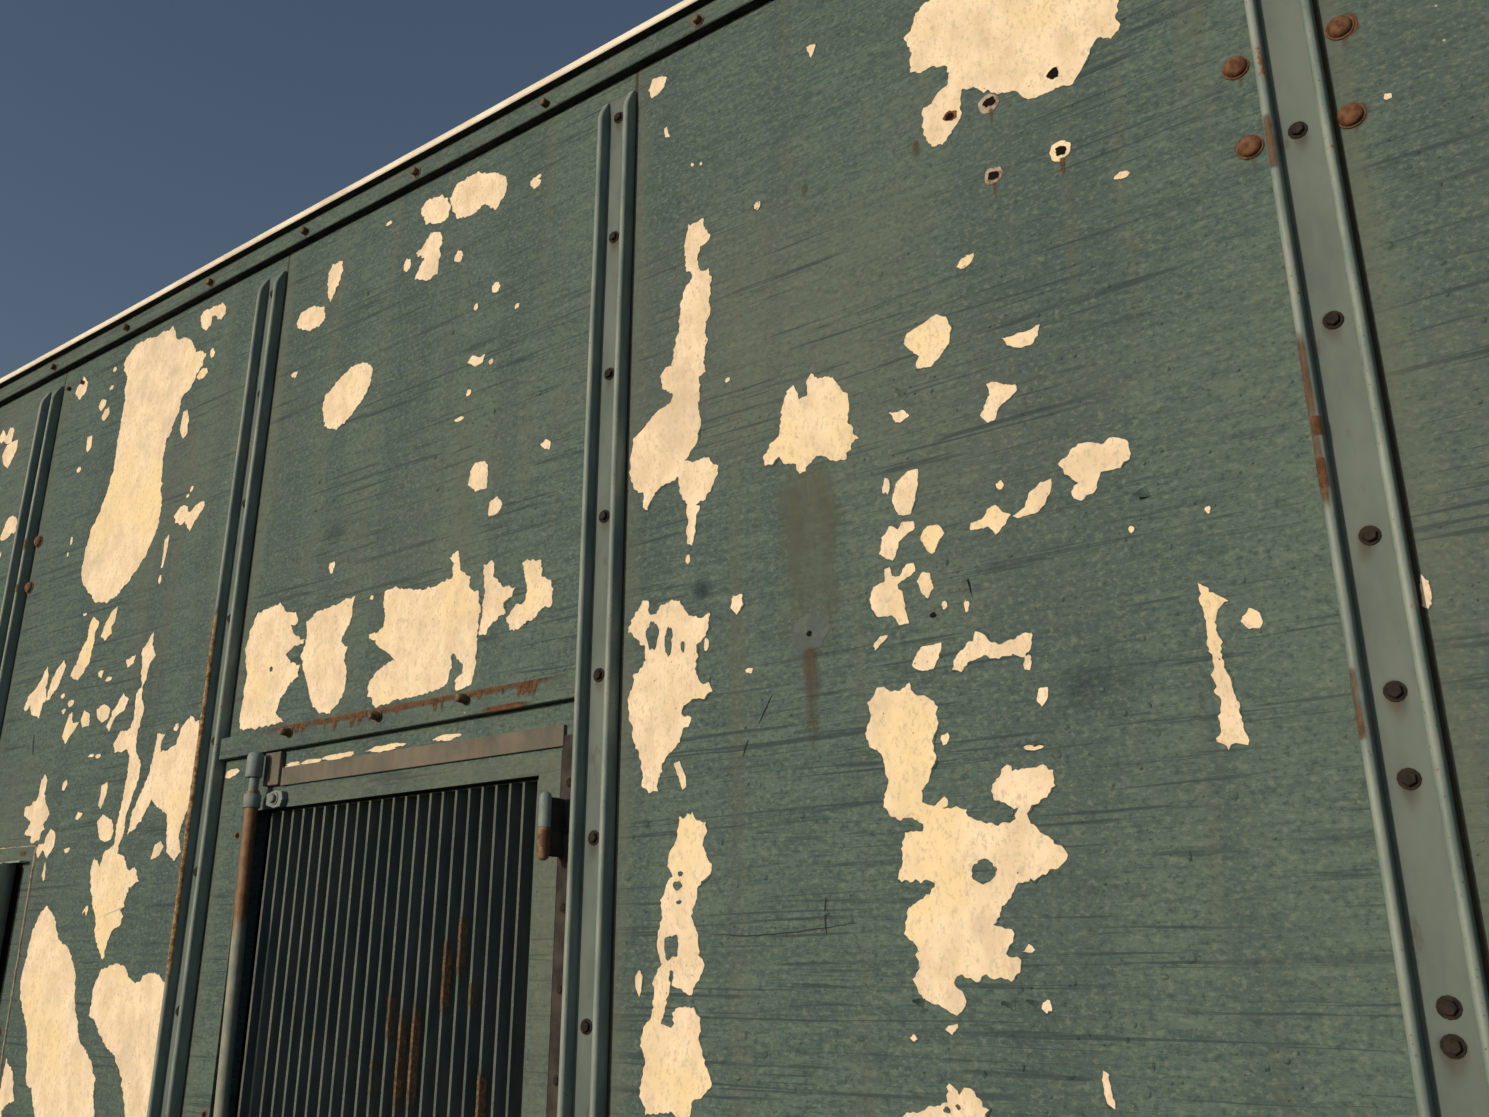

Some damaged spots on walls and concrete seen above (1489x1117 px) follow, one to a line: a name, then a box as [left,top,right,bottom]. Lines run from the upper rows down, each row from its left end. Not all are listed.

peeling [902,0,1121,148]
corrosion [1263,117,1276,167]
peeling [628,217,720,565]
peeling [0,302,227,1117]
peeling [239,550,555,732]
corrosion [273,677,546,734]
peeling [627,599,713,794]
peeling [864,468,1069,1036]
corrosion [385,999,422,1104]
corrosion [440,917,474,1010]
corrosion [475,1075,487,1117]
peeling [634,811,713,1117]